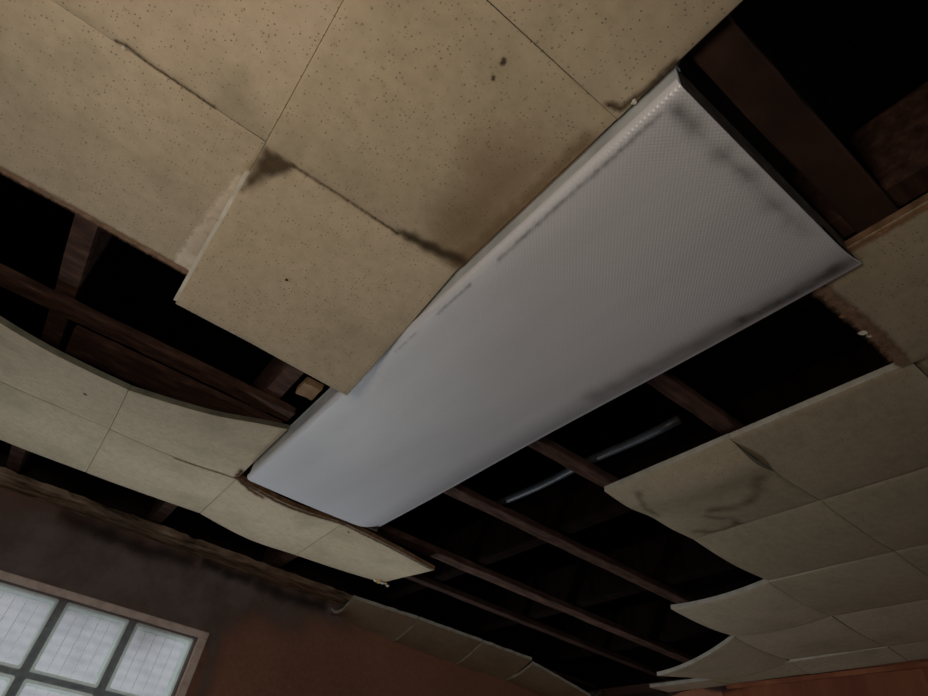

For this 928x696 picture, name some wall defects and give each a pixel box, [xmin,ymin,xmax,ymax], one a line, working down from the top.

water stain [248,149,309,185]
peeling [0,167,243,274]
water stain [318,181,462,262]
spalling [813,284,909,365]